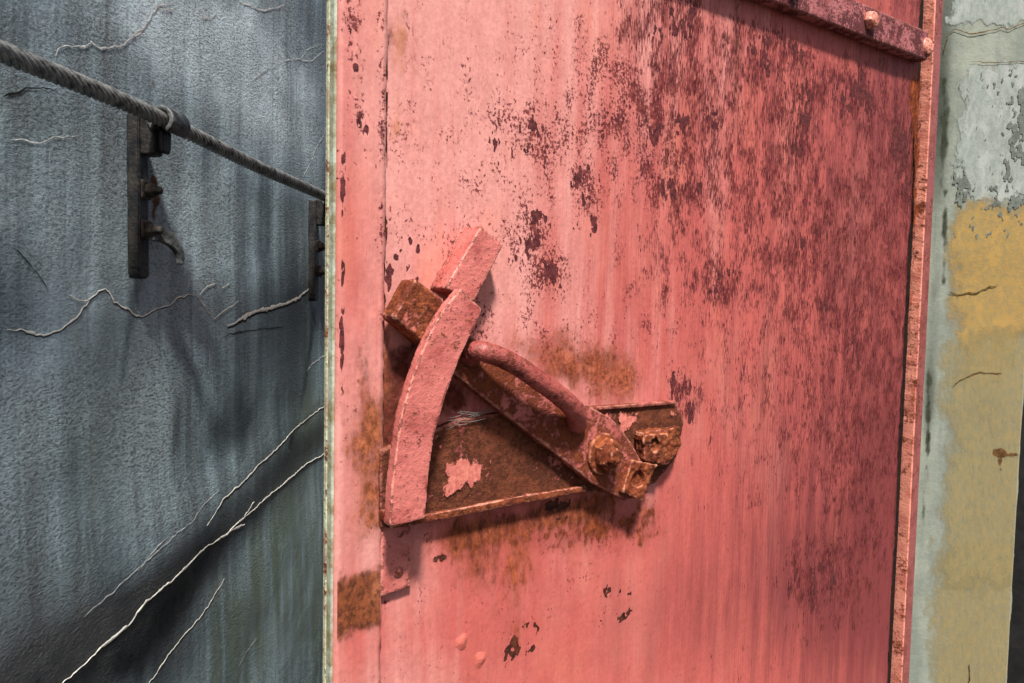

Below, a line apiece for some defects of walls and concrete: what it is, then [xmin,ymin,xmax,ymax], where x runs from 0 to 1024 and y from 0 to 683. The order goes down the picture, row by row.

crack [55,3,173,56]
corrosion [909,76,922,235]
crack [7,248,309,374]
crack [949,286,996,295]
corrosion [346,343,416,528]
corrosion [442,383,466,411]
crack [953,371,1002,387]
peeling [932,60,1024,683]
corrosion [993,448,1017,465]
crack [63,407,324,683]
corrosion [498,505,658,589]
corrosion [337,566,380,640]